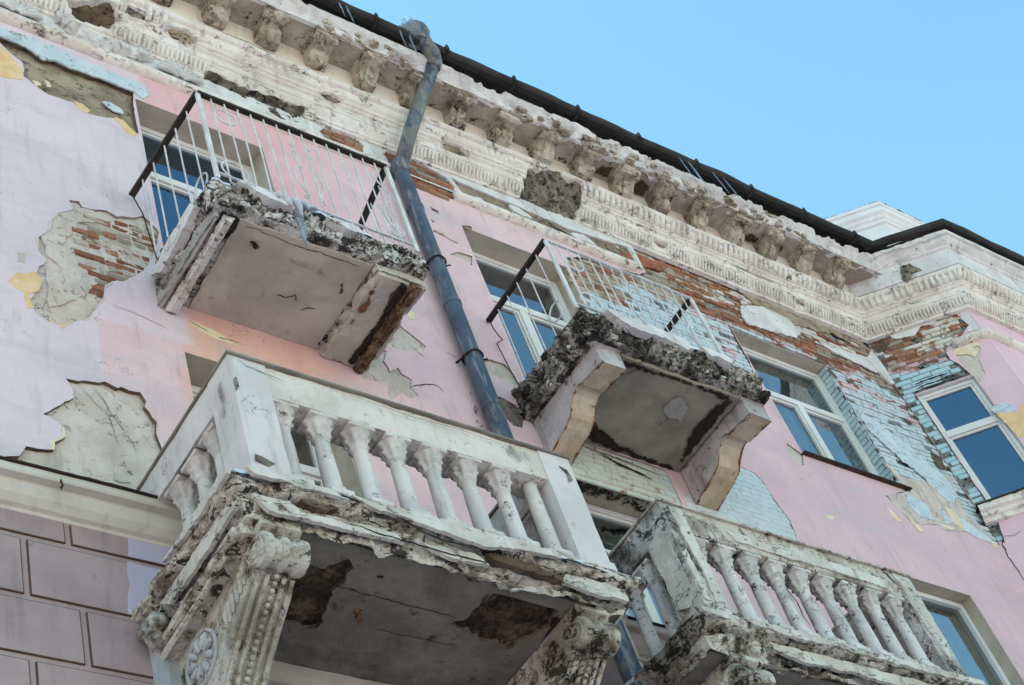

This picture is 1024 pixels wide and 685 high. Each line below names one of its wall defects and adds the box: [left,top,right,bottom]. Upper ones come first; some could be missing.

flaking render [0,27,149,136]
spalling [516,106,810,243]
flaking render [7,202,166,328]
corrosion [350,286,376,324]
flaking render [16,380,164,489]
flaking render [558,242,1004,549]
spalling [285,559,352,625]
spalling [455,593,560,646]